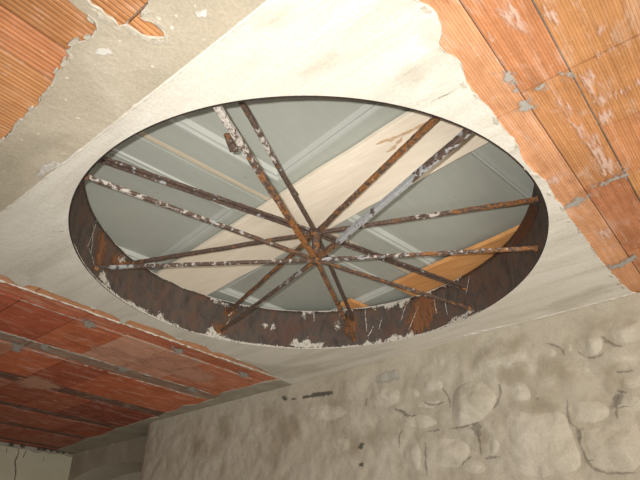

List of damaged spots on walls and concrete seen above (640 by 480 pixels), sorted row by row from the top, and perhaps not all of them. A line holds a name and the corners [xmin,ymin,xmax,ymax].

flaking render [0,0,169,143]
corrosion [513,205,538,244]
peeling [74,244,480,349]
corrosion [405,296,438,335]